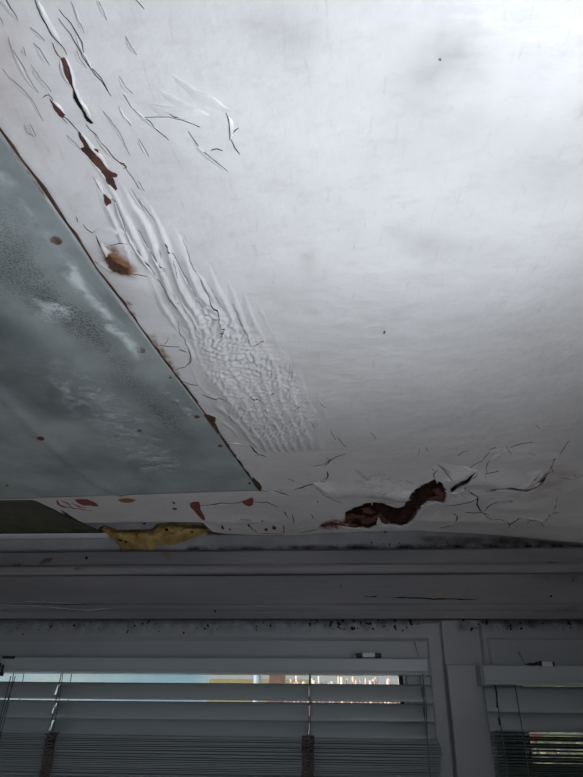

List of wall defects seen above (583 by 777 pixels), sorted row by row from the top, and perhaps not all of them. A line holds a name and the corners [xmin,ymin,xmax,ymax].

crack [0,0,168,221]
crack [188,113,240,172]
crack [76,217,147,277]
corrosion [0,127,259,490]
crack [165,241,263,359]
crack [159,321,277,430]
spalling [321,475,472,533]
crack [418,426,583,528]
mould [309,619,419,632]